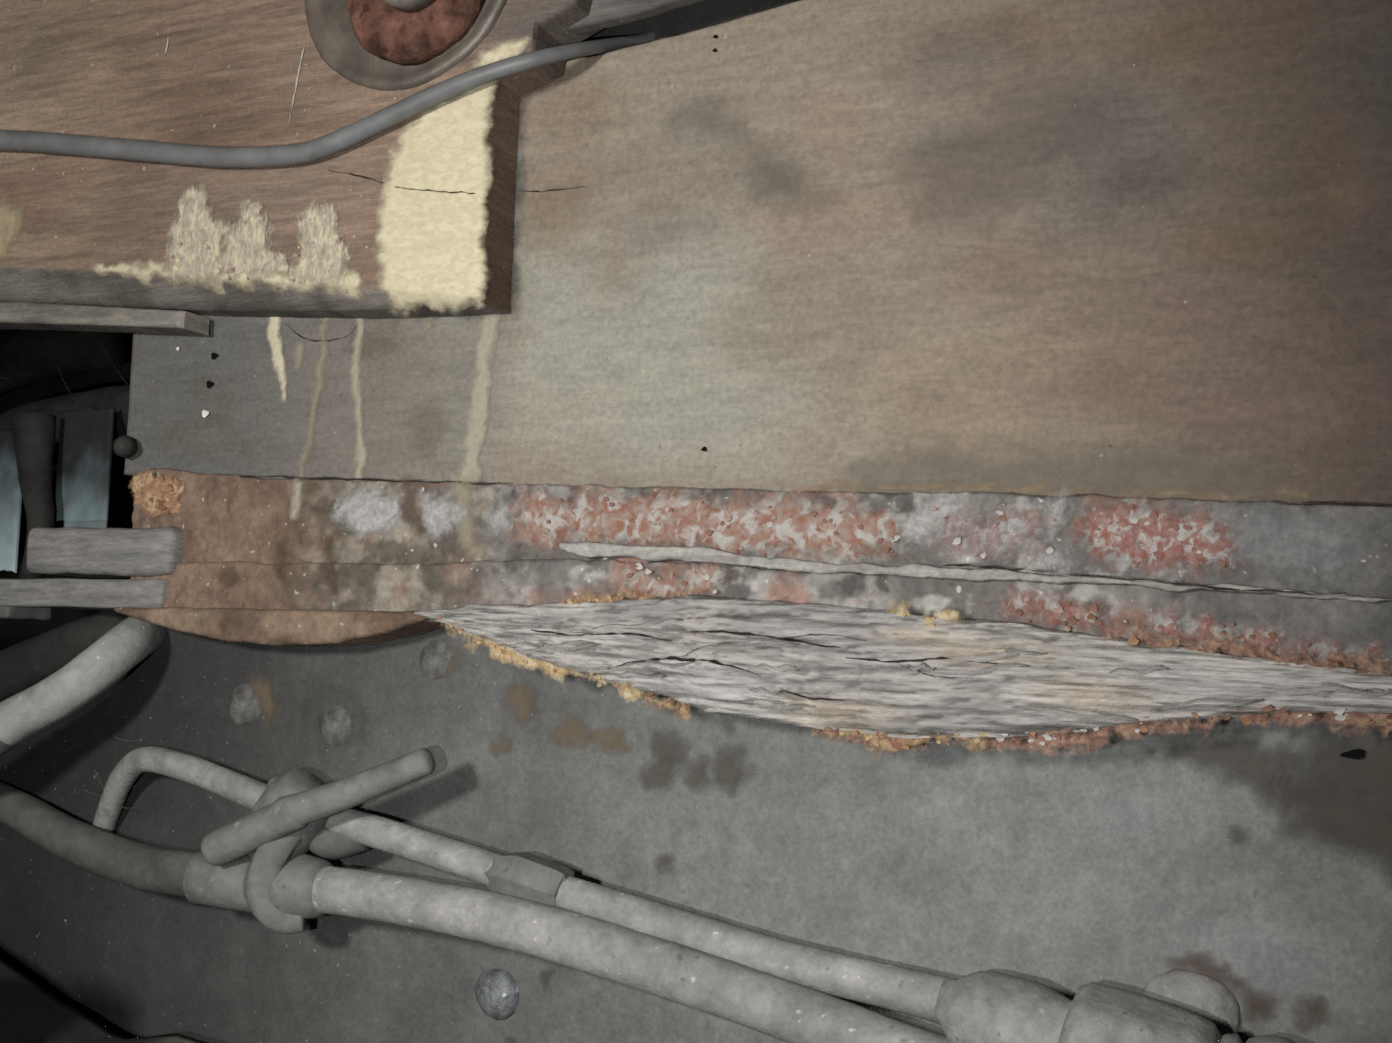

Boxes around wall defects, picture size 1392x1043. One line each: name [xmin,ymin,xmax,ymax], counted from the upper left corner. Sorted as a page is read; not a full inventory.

damp [268,317,303,399]
damp [290,318,328,518]
damp [351,318,366,481]
damp [455,314,499,561]
rust [562,584,691,608]
crack [531,629,999,700]
rust [889,603,959,629]
peeling [1001,591,1341,663]
rust [1101,622,1391,676]